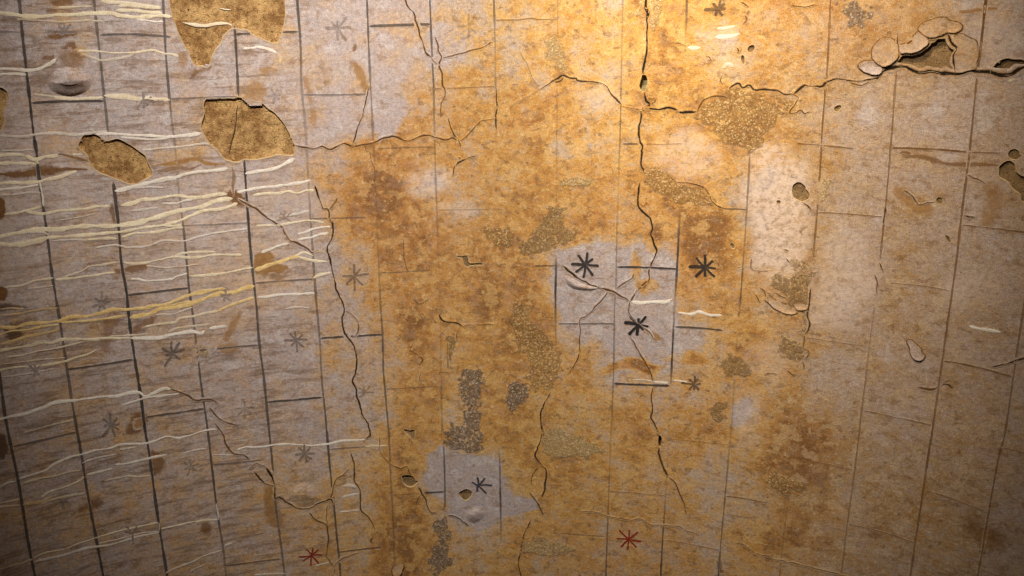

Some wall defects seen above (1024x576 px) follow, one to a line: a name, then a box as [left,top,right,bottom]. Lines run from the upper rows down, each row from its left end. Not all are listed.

efflorescence [0,0,172,23]
flaking render [168,0,287,68]
flaking render [826,16,980,113]
efflorescence [0,130,209,166]
flaking render [77,134,153,185]
flaking render [200,96,296,164]
flaking render [655,84,805,157]
efflorescence [0,167,247,249]
damp [213,0,1024,576]
crack [295,0,1024,576]
damp [0,284,314,378]
crack [170,185,469,573]